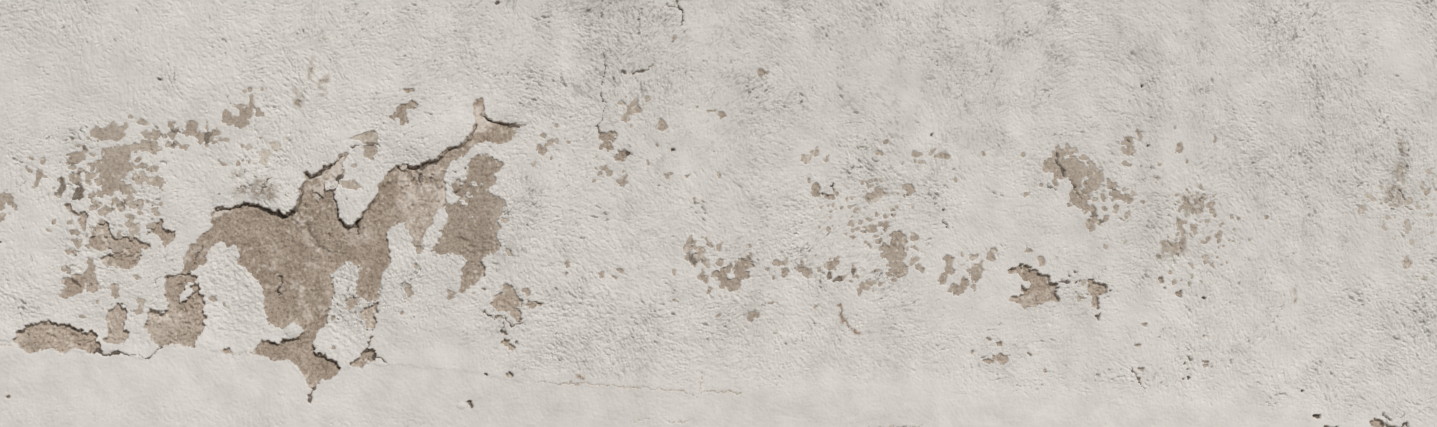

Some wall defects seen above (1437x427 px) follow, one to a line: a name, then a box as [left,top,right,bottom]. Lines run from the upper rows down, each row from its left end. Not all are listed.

peeling [0,190,17,222]
spalling [14,85,542,388]
peeling [531,124,570,167]
spalling [672,134,1059,318]
peeling [1023,131,1144,249]
peeling [1117,129,1161,181]
peeling [1156,185,1250,299]
spalling [1077,279,1106,320]